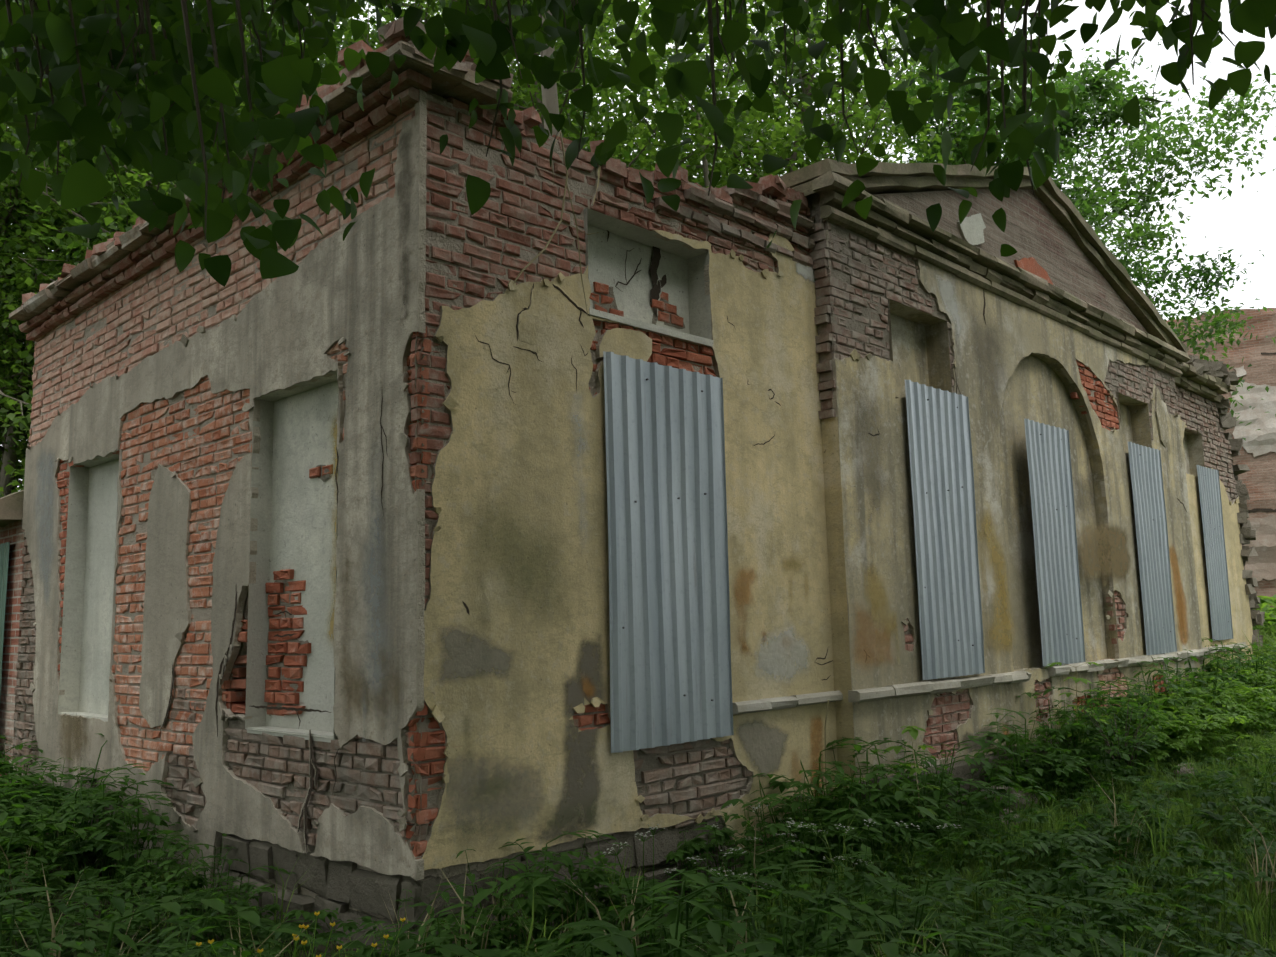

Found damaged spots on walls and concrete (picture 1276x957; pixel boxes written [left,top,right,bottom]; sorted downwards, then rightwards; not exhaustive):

peeling [27,93,957,604]
peeling [1070,360,1238,505]
spalling [109,377,460,859]
spalling [633,739,752,828]
spalling [923,689,970,759]